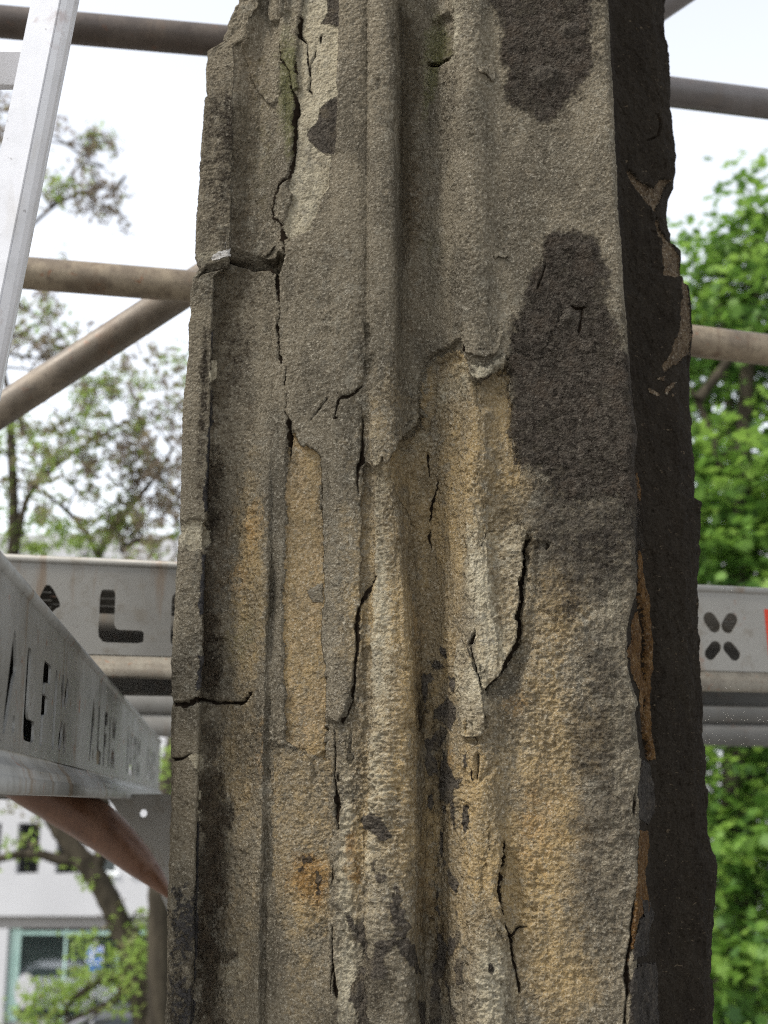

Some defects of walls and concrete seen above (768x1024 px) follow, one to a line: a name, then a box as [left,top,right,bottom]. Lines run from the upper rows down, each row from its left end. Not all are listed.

crack [209,17,362,457]
crack [357,420,365,494]
spalling [369,317,526,737]
crack [469,539,549,690]
crack [175,692,253,708]
spalling [270,432,353,968]
crack [334,576,377,829]
peeling [484,821,507,941]
crack [497,842,528,992]